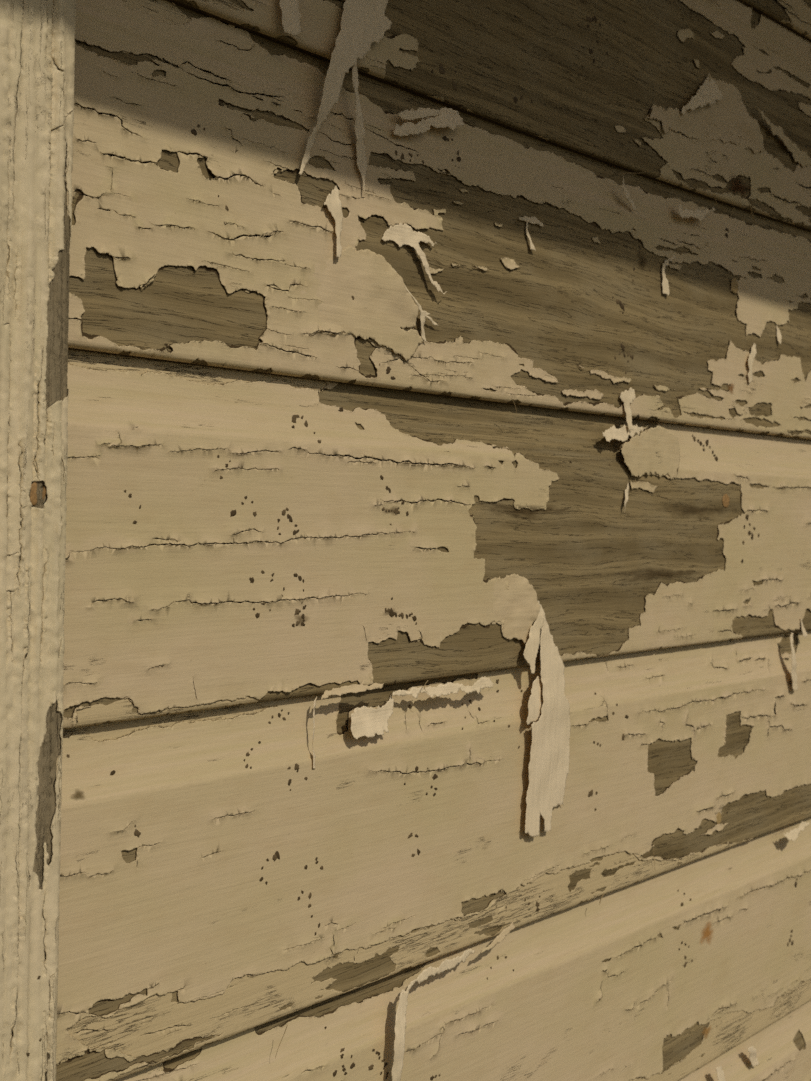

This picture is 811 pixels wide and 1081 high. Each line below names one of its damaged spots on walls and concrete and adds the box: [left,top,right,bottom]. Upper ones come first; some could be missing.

peeling [235,24,330,75]
crack [181,62,296,111]
crack [51,104,150,164]
peeling [342,0,811,241]
crack [68,443,464,505]
crack [65,529,435,559]
peeling [33,150,811,889]
crack [138,595,347,621]
peeling [45,784,811,1081]